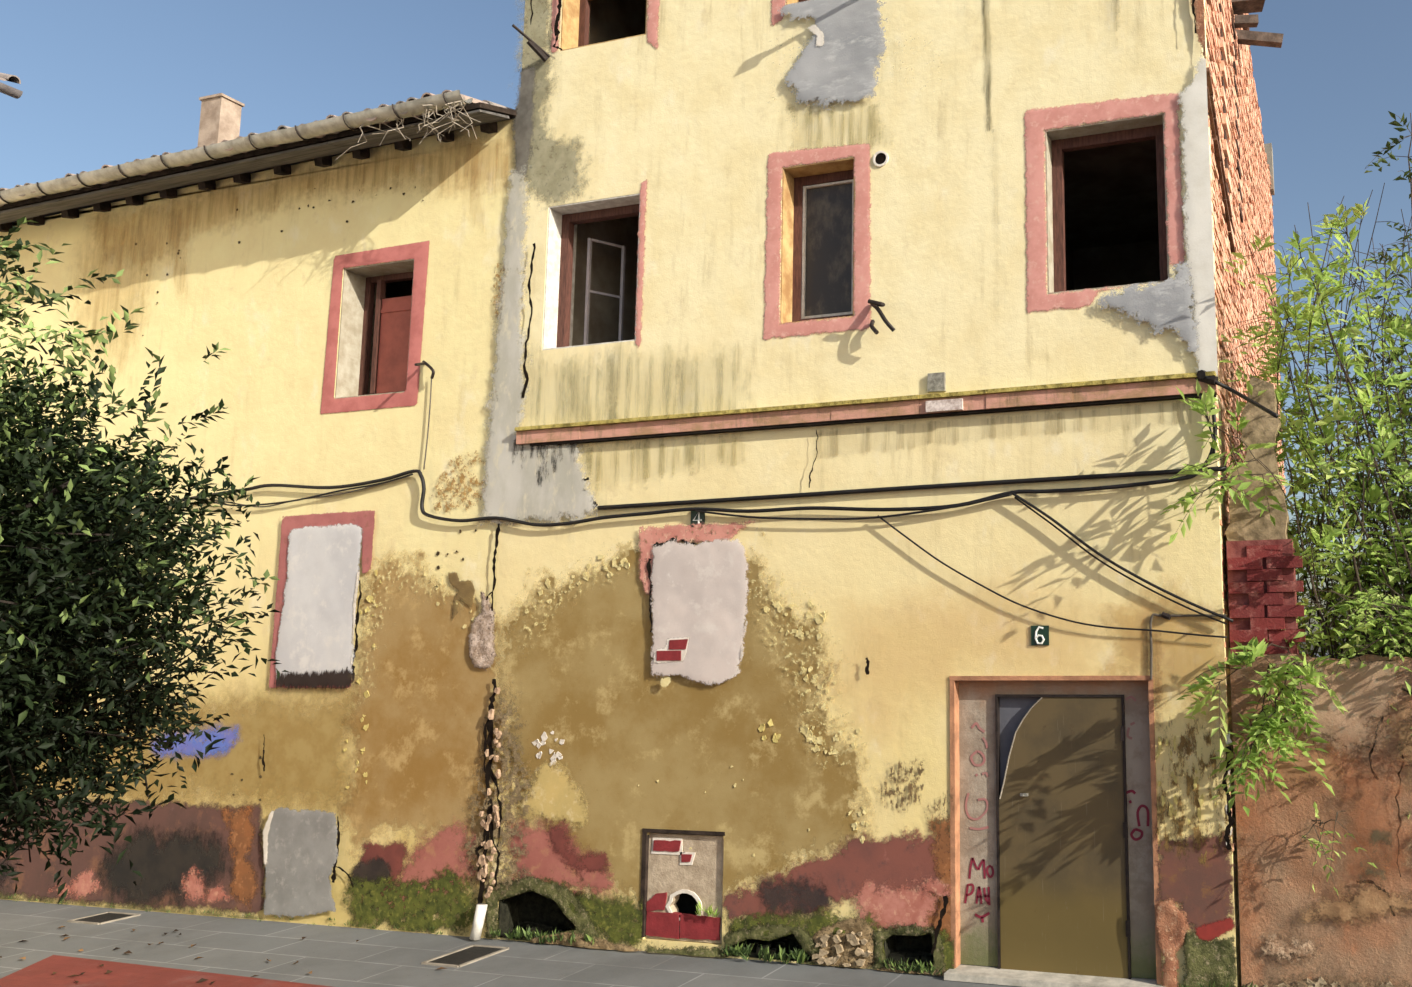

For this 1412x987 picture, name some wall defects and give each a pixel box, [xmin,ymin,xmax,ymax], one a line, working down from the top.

peeling [808,25,824,46]
peeling [492,263,505,323]
peeling [269,510,497,789]
water stain [21,542,873,922]
crack [475,679,502,904]
peeling [515,521,755,649]
peeling [351,688,954,976]
flaking render [656,639,688,687]
peeling [749,571,865,769]
peeling [1155,717,1412,987]
crack [1342,652,1412,916]